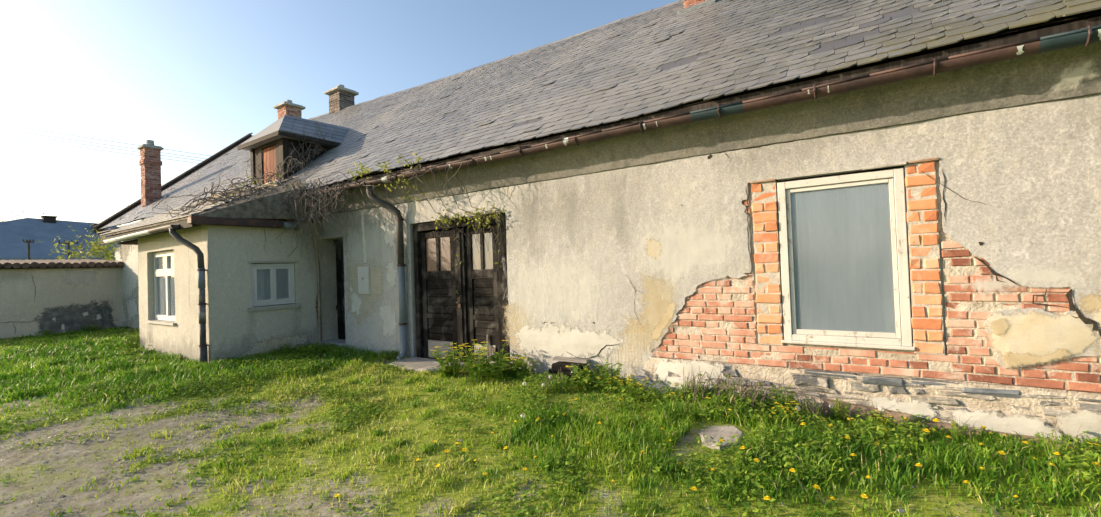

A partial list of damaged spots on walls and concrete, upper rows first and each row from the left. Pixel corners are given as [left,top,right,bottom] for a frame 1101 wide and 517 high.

peeling [1057,62,1093,87]
spalling [742,195,753,214]
spalling [630,240,1101,393]